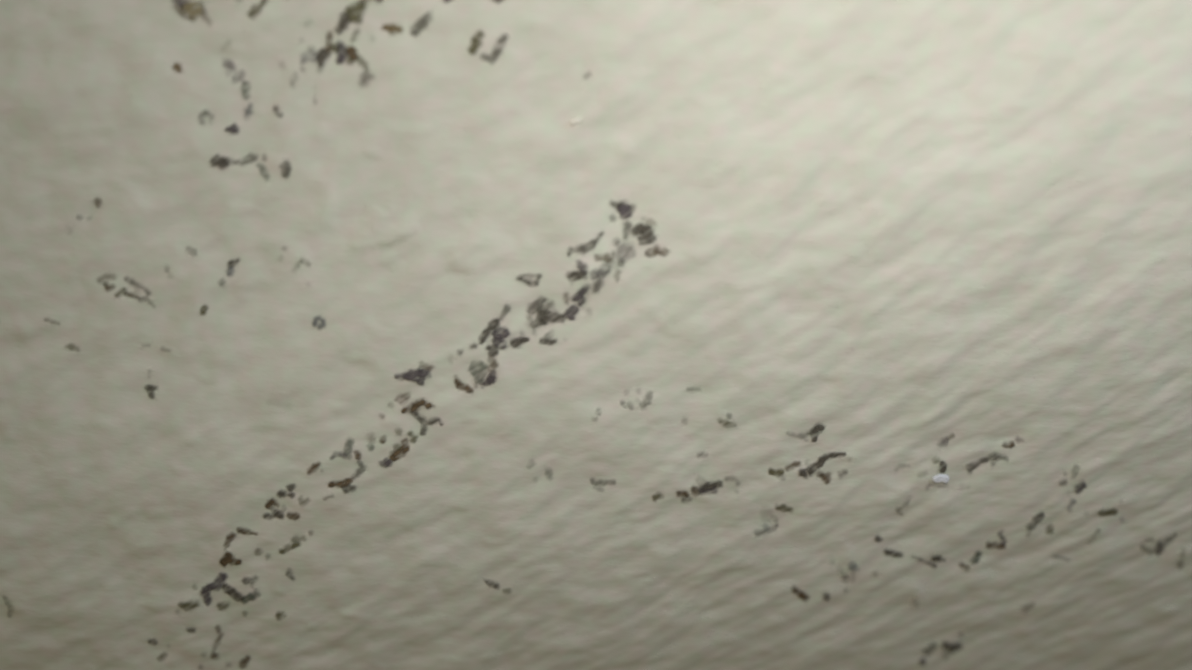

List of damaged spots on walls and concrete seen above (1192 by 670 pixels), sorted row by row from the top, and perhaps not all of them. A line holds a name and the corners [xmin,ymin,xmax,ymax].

leakage [480,319,499,344]
leakage [395,370,424,385]
leakage [402,400,442,425]
leakage [329,464,362,487]
leakage [807,453,846,483]
leakage [220,529,255,566]